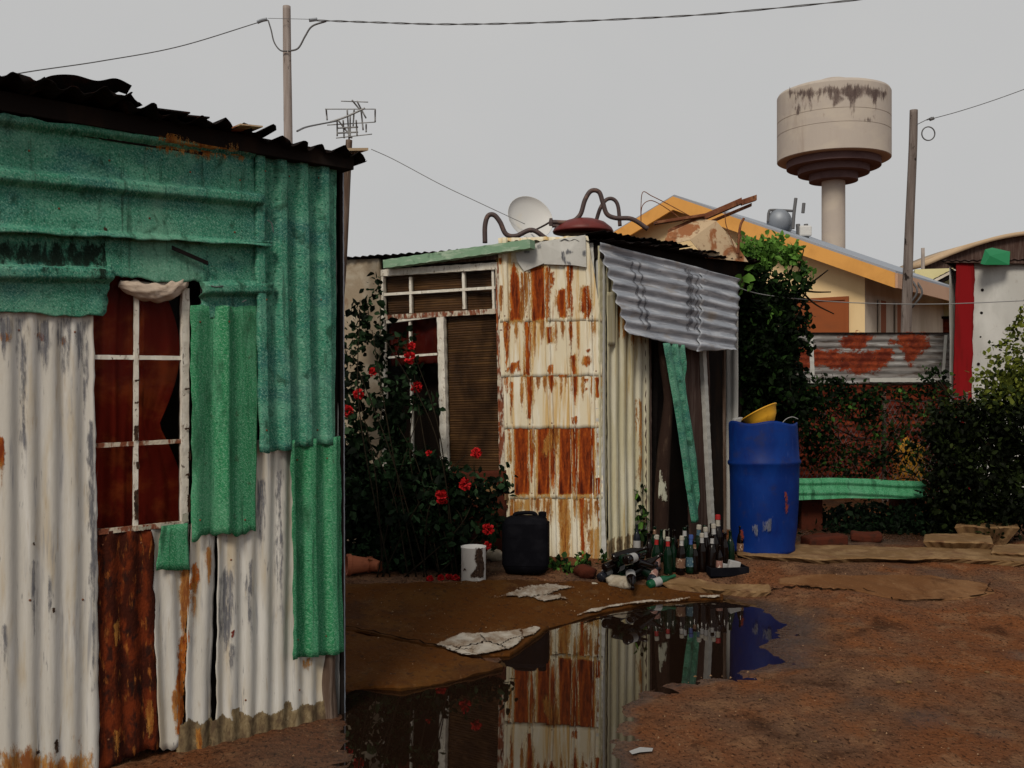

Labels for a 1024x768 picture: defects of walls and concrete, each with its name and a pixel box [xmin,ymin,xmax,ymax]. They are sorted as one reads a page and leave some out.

leakage [789,84,886,114]
rust [796,330,931,376]
rust [498,256,602,559]
rust [171,547,212,735]
rust [146,700,154,735]
leakage [175,700,326,752]
rust [0,745,93,768]